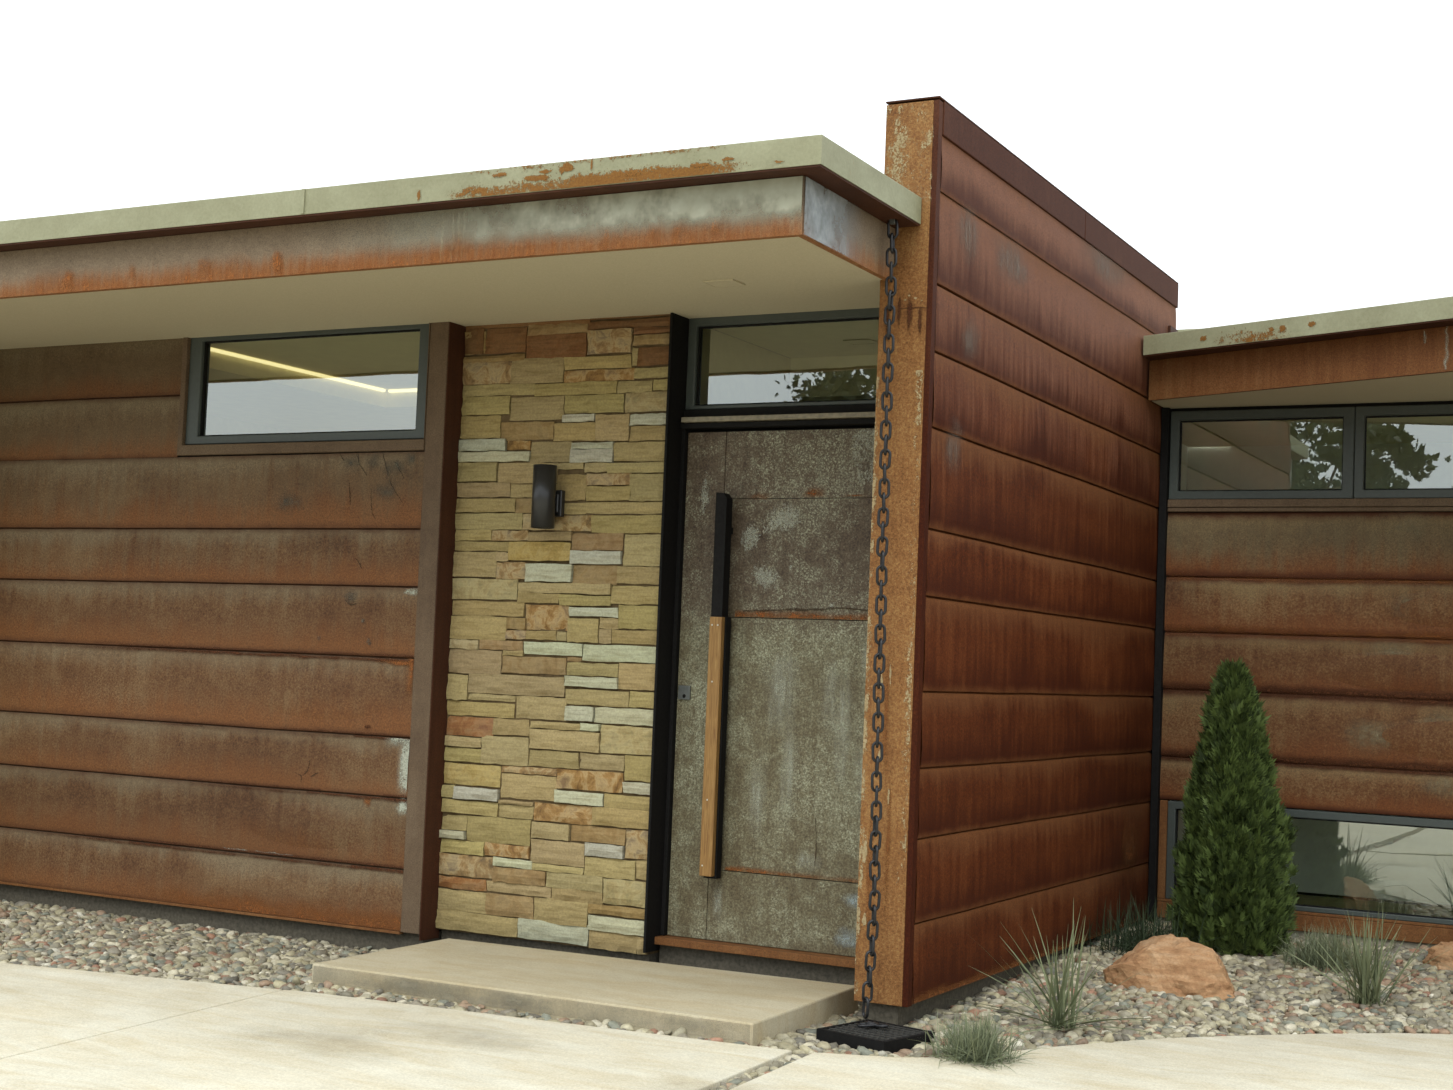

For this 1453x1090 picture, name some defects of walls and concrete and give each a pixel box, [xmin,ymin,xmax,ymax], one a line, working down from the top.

rust [885,106,932,198]
rust [4,219,718,297]
rust [886,298,928,333]
rust [1200,322,1286,345]
rust [105,644,414,686]
rust [1259,687,1453,705]
rust [307,725,410,741]
rust [1272,757,1453,776]
rust [206,780,407,804]
rust [68,834,403,874]